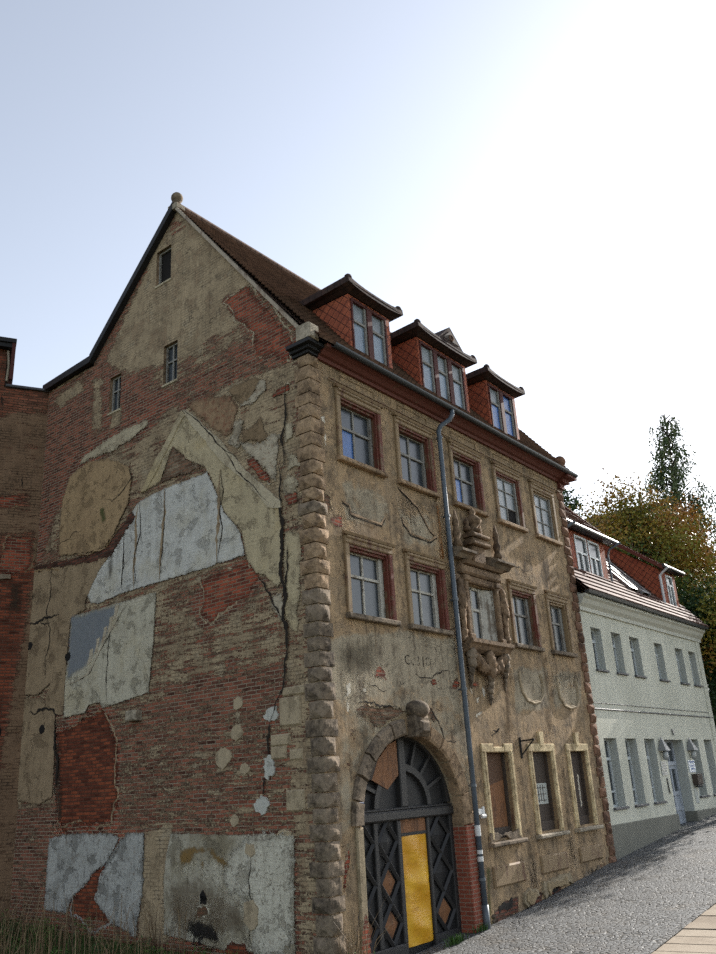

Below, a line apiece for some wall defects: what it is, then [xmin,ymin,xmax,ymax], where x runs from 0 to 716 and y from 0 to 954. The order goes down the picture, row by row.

spalling [222,285,295,362]
spalling [198,560,259,625]
crack [183,381,288,754]
spalling [346,683,407,728]
spalling [39,709,121,834]
spalling [70,838,121,934]
spalling [492,887,561,923]